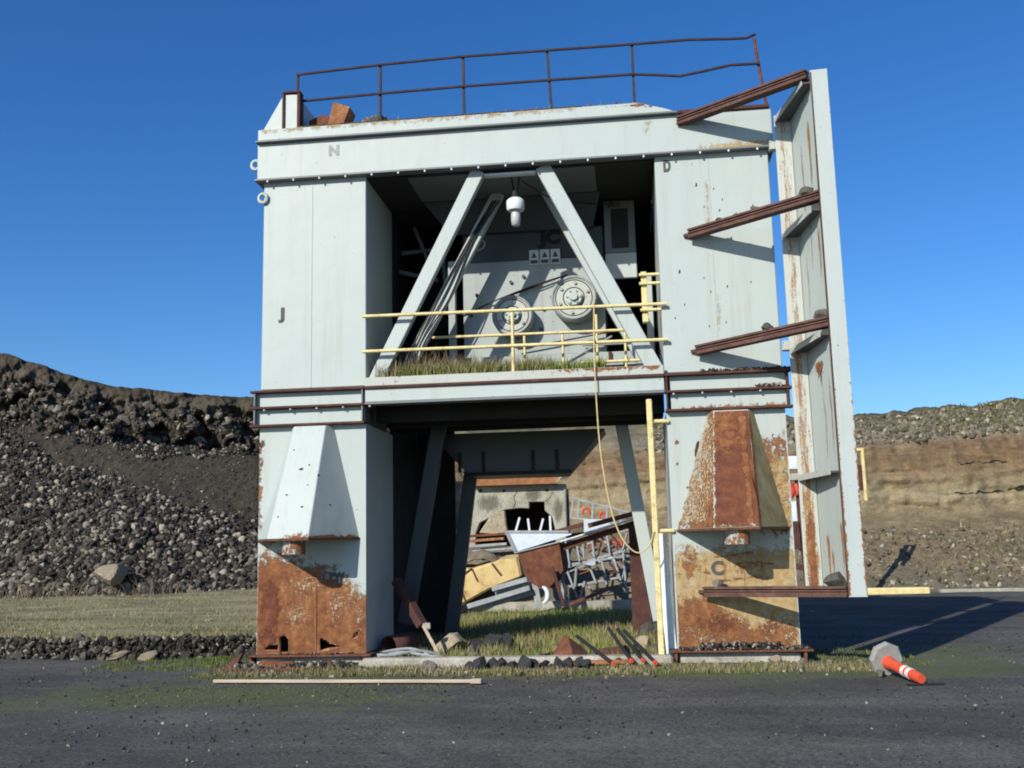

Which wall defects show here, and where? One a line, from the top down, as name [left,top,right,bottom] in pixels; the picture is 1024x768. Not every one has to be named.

corrosion [256,439,366,654]
corrosion [674,223,851,648]
corrosion [851,400,868,595]